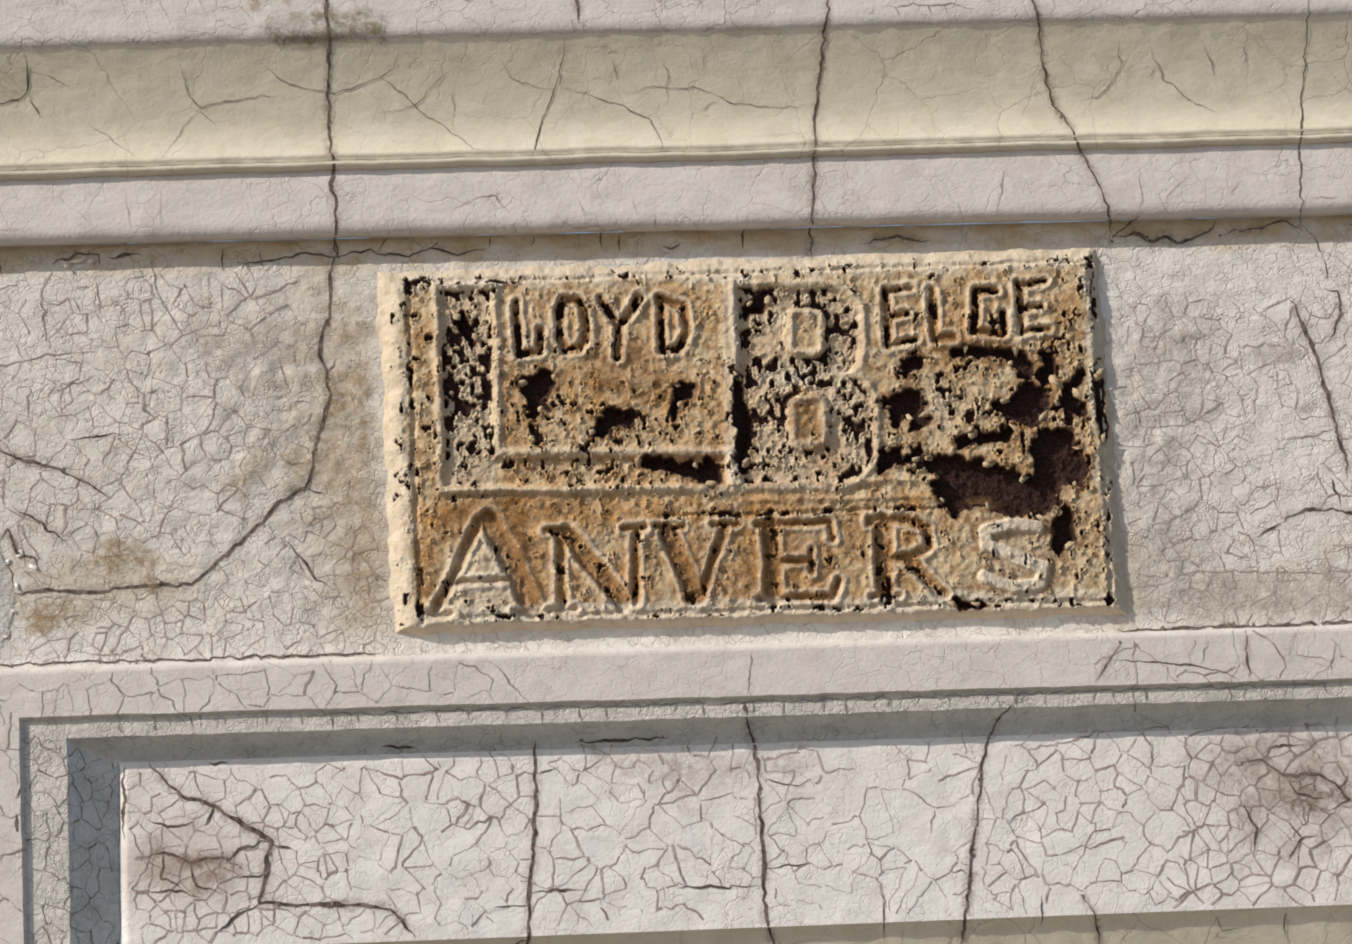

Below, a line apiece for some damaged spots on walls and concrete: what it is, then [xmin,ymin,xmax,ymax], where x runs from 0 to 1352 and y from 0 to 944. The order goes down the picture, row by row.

crack [500,0,830,265]
crack [1031,0,1218,244]
crack [864,234,930,244]
crack [0,0,491,733]
spalling [451,309,480,348]
spalling [515,368,557,423]
spalling [587,405,640,439]
spalling [634,365,756,491]
spalling [741,290,773,322]
spalling [873,343,1110,559]
crack [0,279,1352,944]
spalling [947,595,991,612]